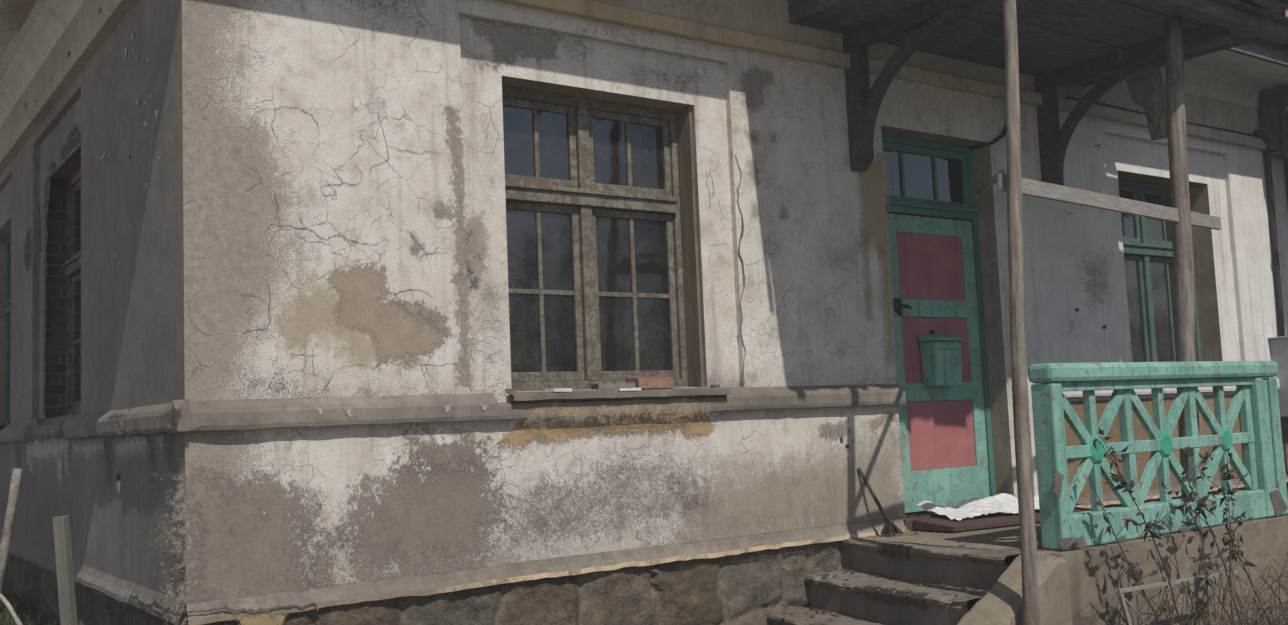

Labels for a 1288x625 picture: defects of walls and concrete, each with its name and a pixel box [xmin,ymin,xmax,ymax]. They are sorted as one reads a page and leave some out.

peeling [470,17,561,71]
crack [260,106,319,142]
crack [325,101,438,186]
crack [264,191,448,256]
flaking render [277,104,505,389]
crack [709,155,746,383]
crack [236,286,273,333]
peeling [498,397,715,453]
damp [26,434,164,484]
damp [150,421,706,625]